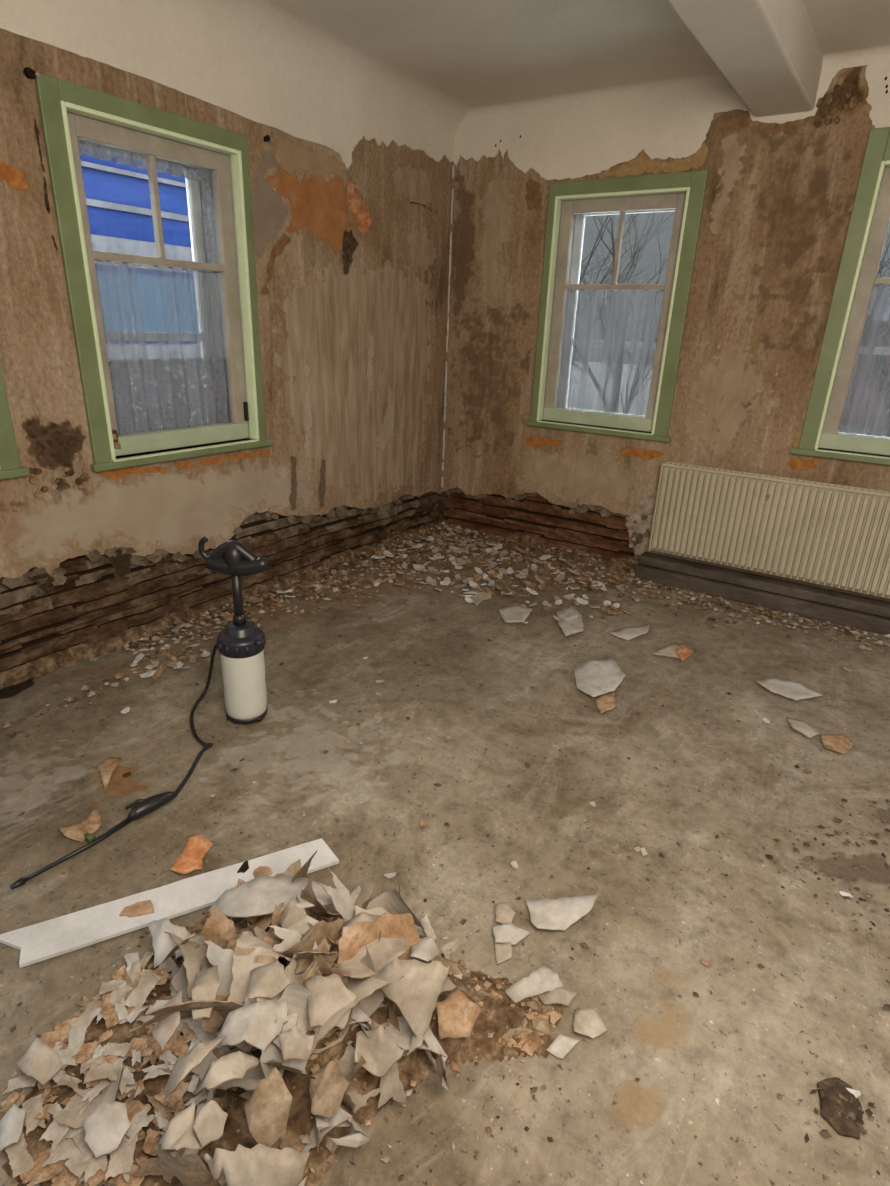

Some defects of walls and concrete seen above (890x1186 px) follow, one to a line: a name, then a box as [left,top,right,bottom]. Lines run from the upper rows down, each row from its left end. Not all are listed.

flaking render [713,66,869,138]
peeling [262,135,372,295]
water stain [270,226,437,511]
water stain [448,175,530,458]
spalling [0,487,658,689]
flaking render [594,692,616,714]